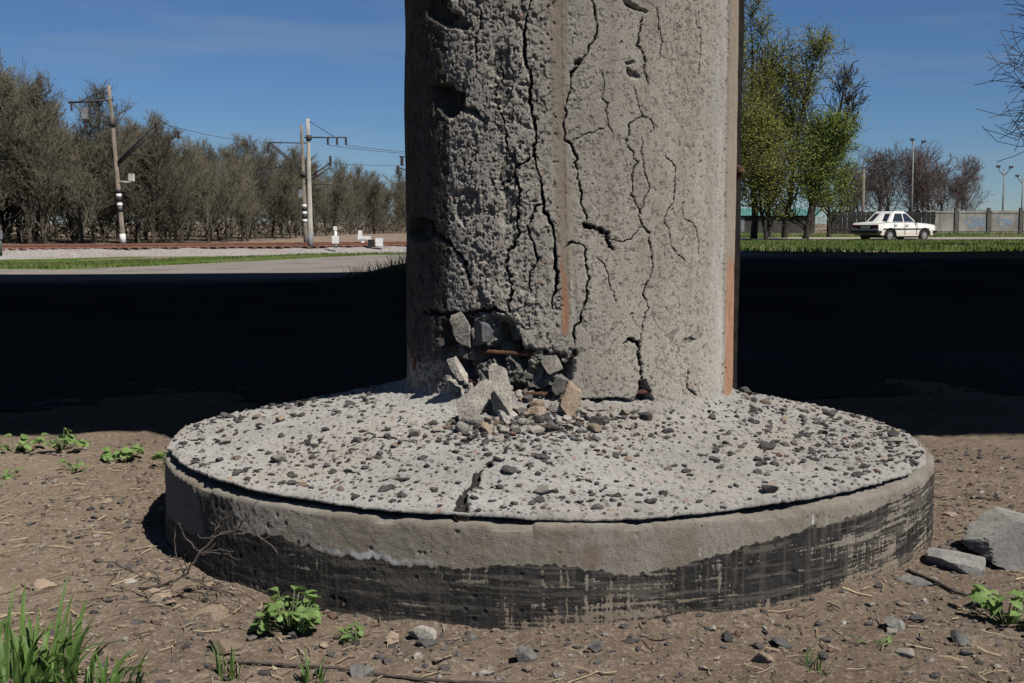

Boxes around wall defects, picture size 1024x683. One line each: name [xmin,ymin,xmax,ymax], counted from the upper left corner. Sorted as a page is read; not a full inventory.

crack [425,0,699,398]
spalling [446,315,574,399]
rust [724,262,735,396]
damp [197,488,236,536]
crack [207,444,510,522]
efflorescence [352,551,396,564]